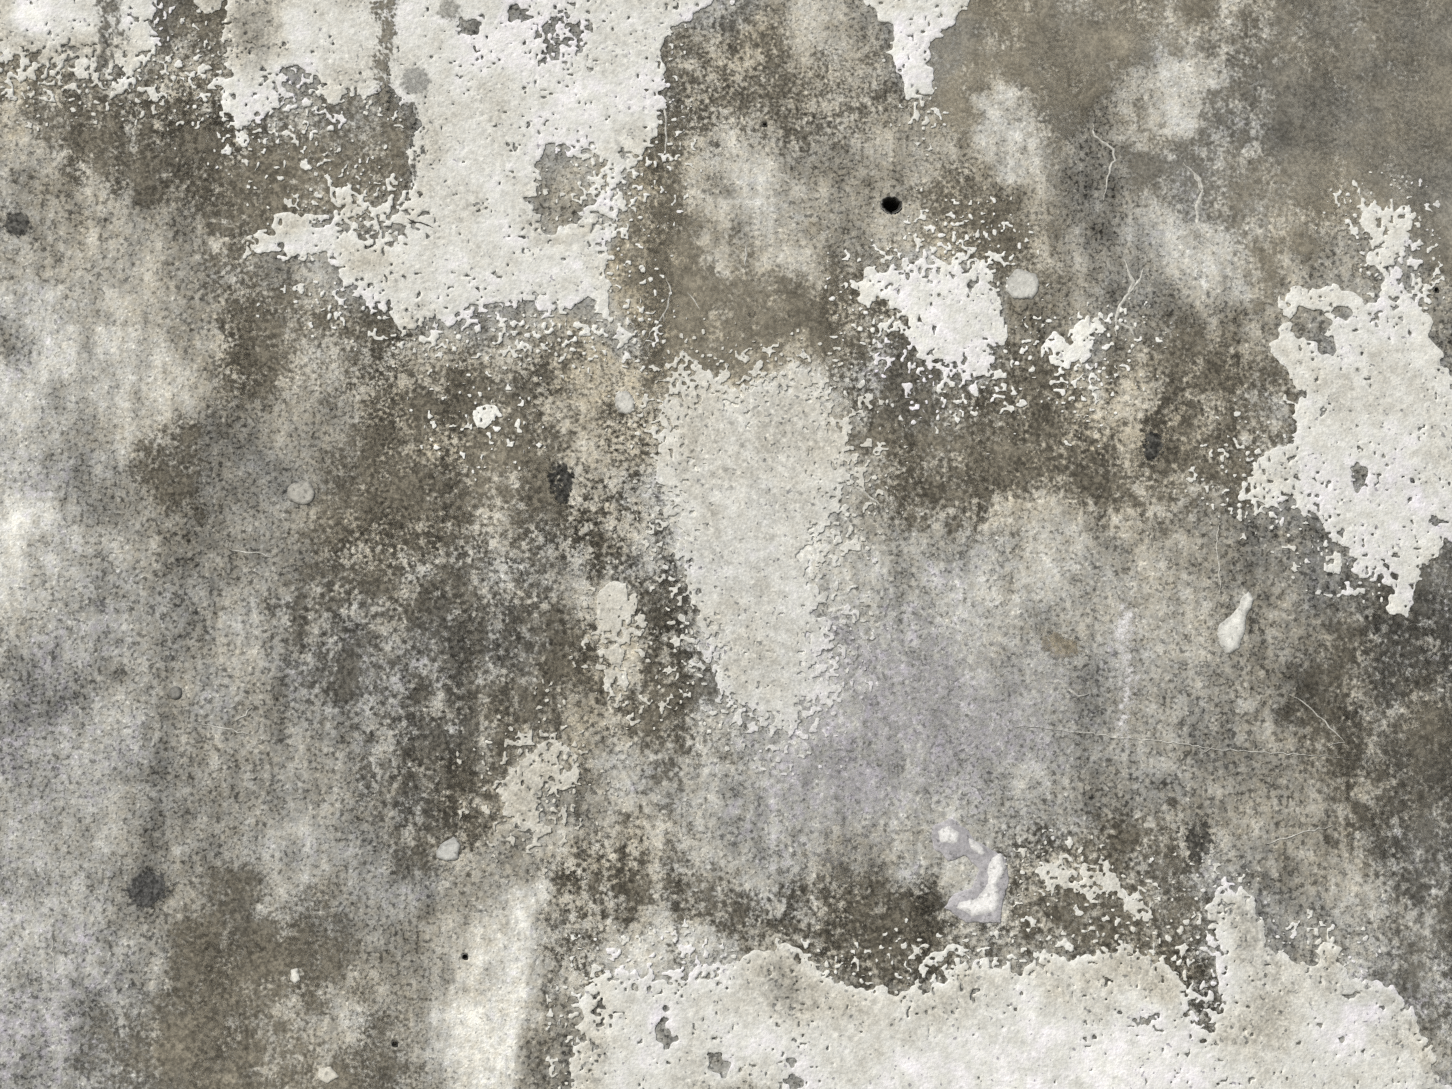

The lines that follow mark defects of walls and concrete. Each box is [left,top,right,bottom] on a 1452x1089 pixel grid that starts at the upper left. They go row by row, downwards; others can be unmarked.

peeling [0,0,1178,691]
damp [0,0,1305,879]
damp [901,0,1452,311]
peeling [1185,171,1452,618]
damp [537,798,1237,1048]
peeling [546,829,1452,1089]
damp [1276,551,1452,1054]